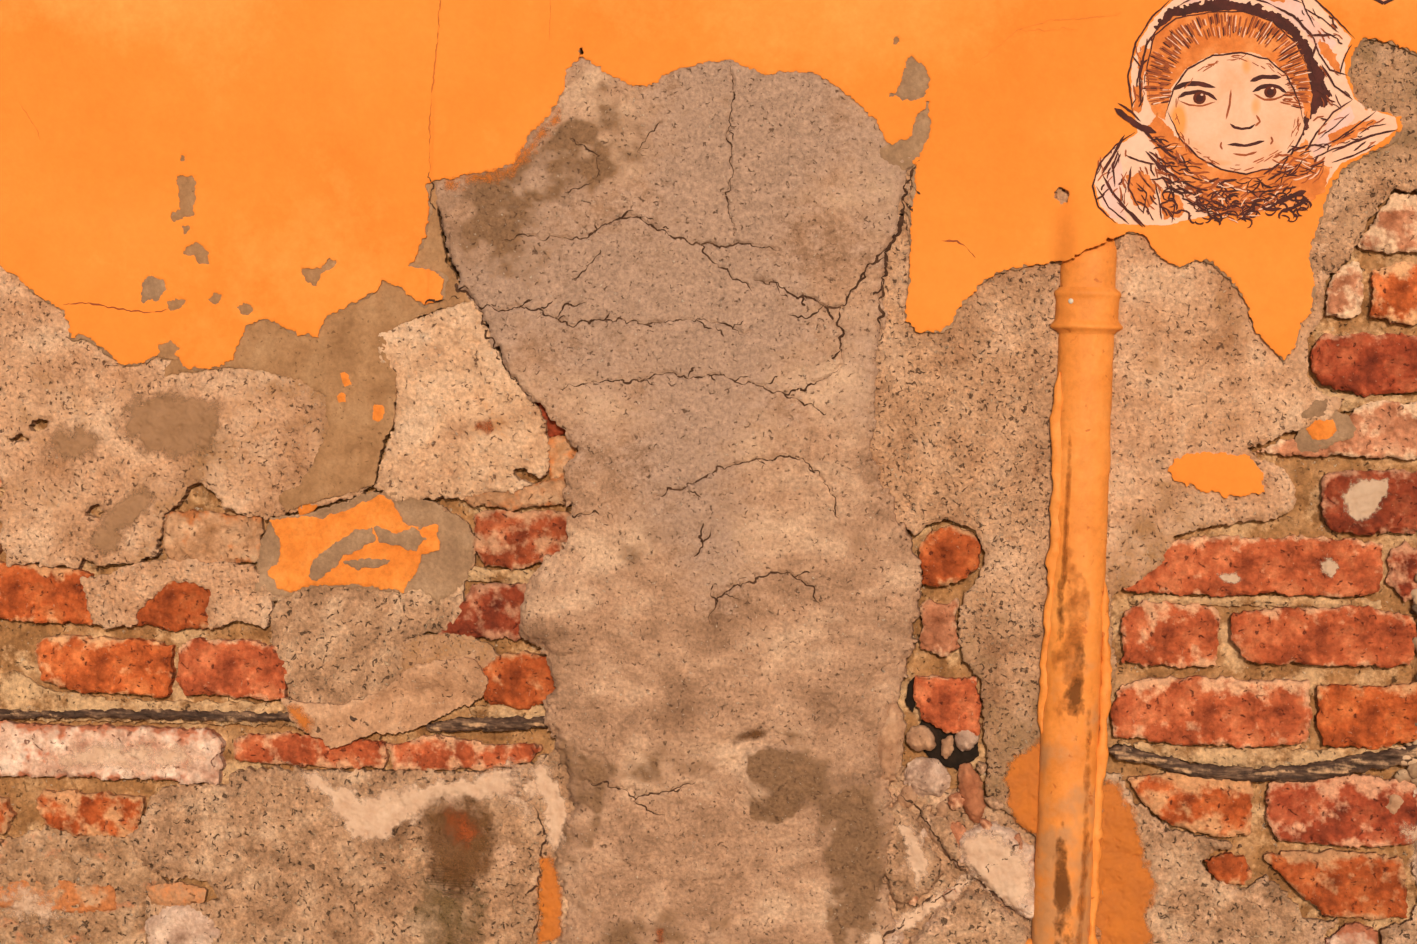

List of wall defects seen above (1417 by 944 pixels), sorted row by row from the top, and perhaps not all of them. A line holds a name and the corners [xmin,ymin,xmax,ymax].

peeling [171,155,209,264]
peeling [302,259,336,286]
crack [424,0,920,415]
spalling [1054,188,1069,204]
spalling [0,267,579,944]
crack [657,455,836,624]
spalling [870,56,1061,944]
spalling [1099,40,1417,944]
leakage [302,760,568,944]